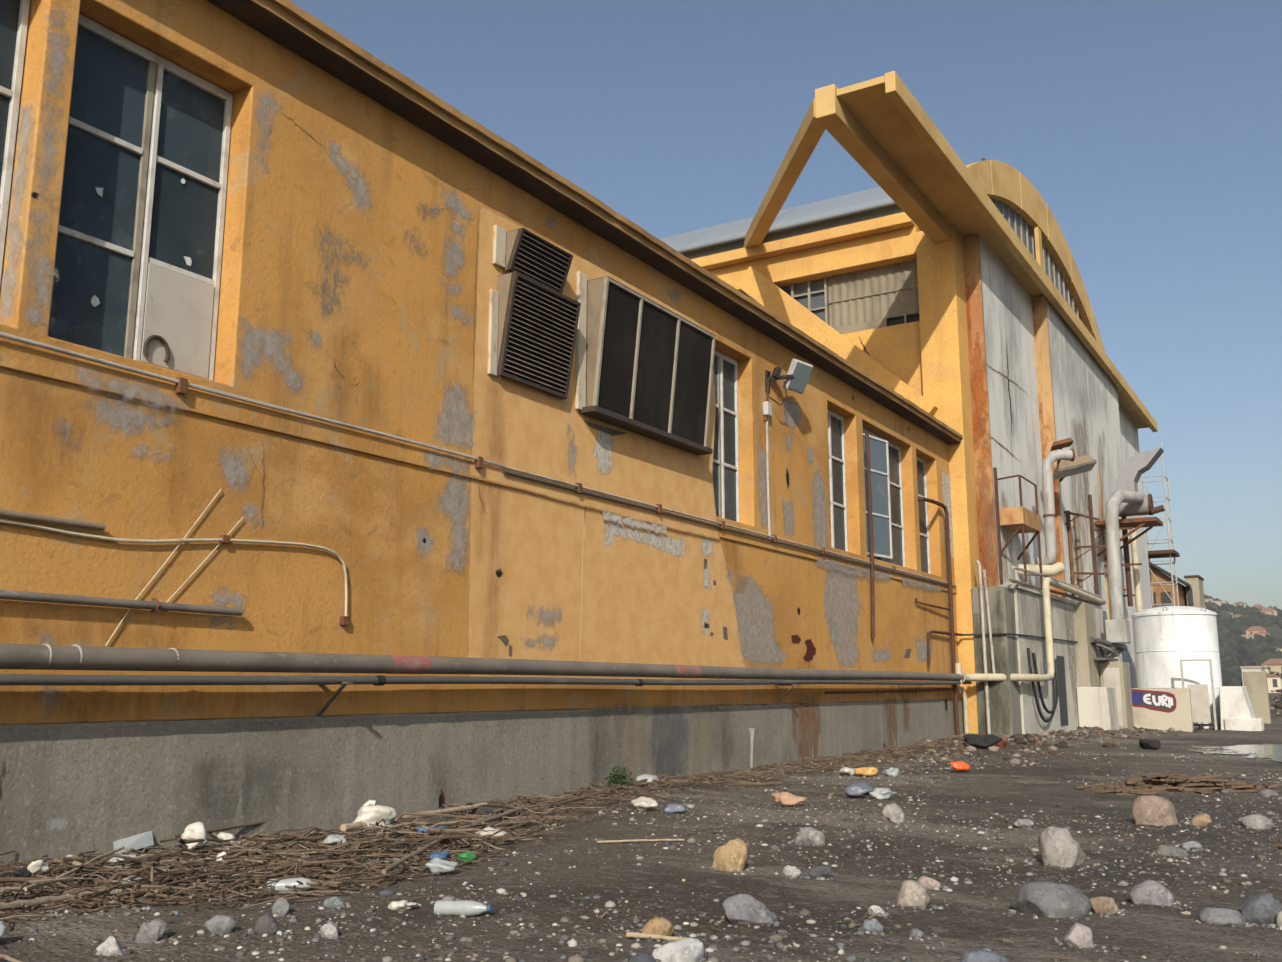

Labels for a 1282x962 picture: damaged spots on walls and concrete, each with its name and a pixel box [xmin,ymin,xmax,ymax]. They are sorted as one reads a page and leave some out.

peeling [330,143,370,210]
peeling [240,322,301,392]
peeling [424,386,474,571]
peeling [603,511,685,557]
peeling [701,536,788,665]
peeling [758,447,795,535]
peeling [784,399,802,451]
peeling [807,448,942,667]
corrosion [966,302,996,587]
corrosion [792,635,816,662]